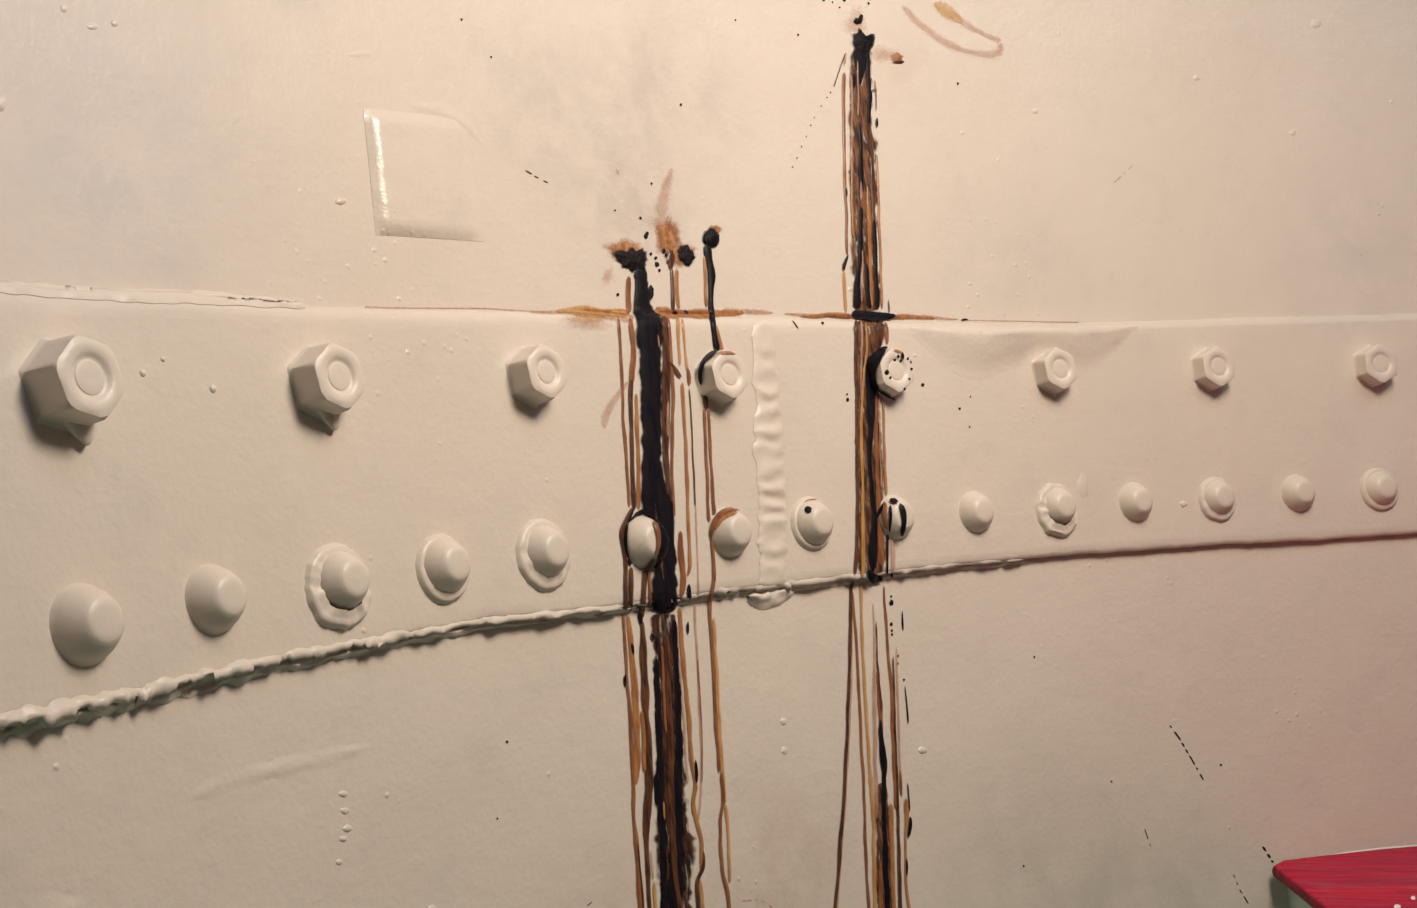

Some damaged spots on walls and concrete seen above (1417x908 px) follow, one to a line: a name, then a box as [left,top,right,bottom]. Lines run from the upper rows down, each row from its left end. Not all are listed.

rust [532,14,968,908]